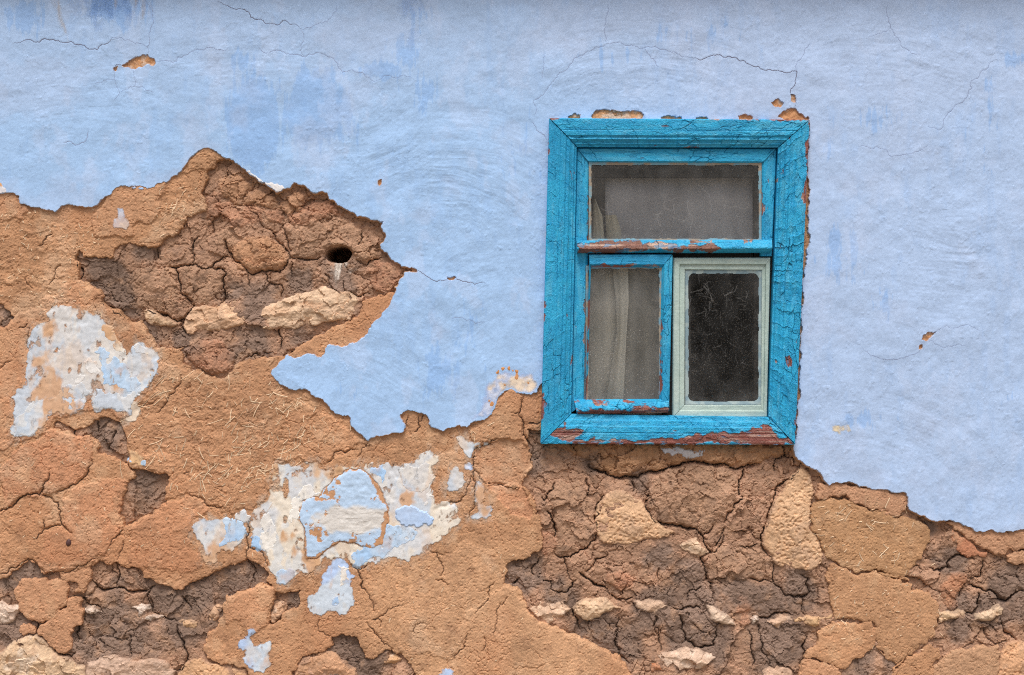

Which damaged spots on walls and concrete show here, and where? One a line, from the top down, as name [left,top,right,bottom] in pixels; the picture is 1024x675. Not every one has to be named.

crack [14,3,229,99]
spalling [114,55,155,71]
crack [533,8,811,140]
crack [862,61,993,157]
spalling [0,148,1024,675]
crack [515,399,540,461]
crack [0,462,124,575]
crack [246,524,268,566]
crack [450,439,517,517]
crack [353,566,399,647]
crack [454,585,507,658]